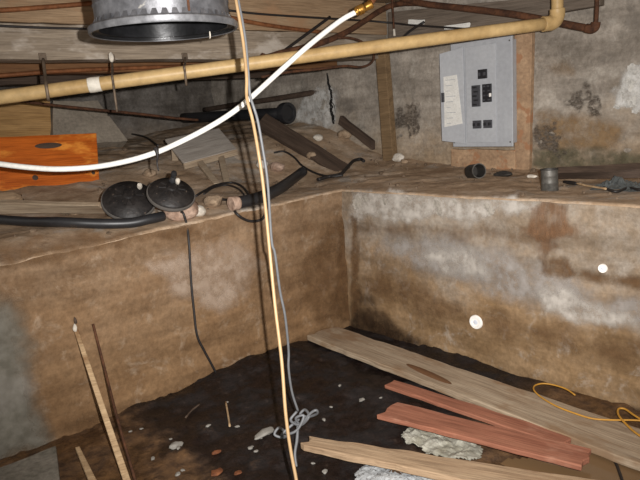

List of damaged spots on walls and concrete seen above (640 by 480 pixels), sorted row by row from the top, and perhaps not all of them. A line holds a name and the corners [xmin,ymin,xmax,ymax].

crack [326,73,335,124]
leakage [393,240,640,326]